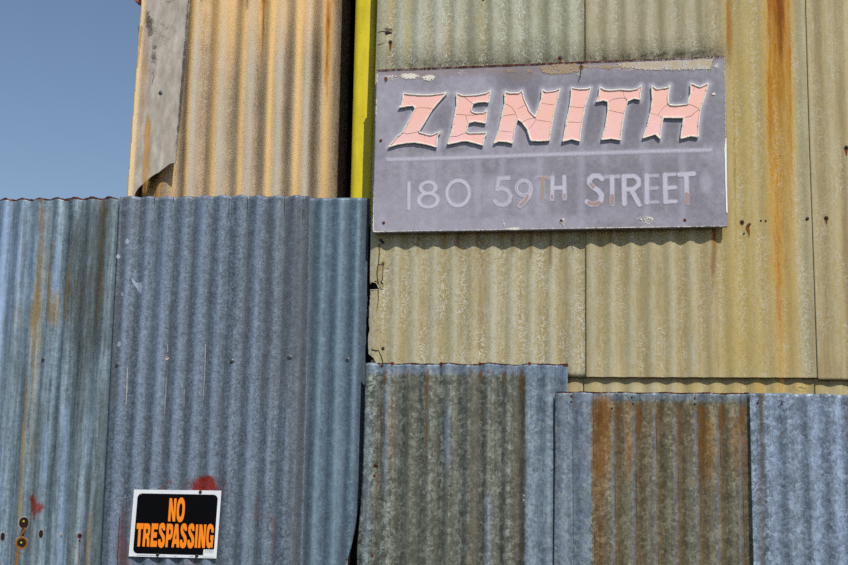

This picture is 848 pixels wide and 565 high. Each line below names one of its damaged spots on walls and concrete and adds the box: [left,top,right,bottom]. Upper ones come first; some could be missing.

corrosion [768,0,790,100]
corrosion [378,362,568,400]
corrosion [557,391,749,461]